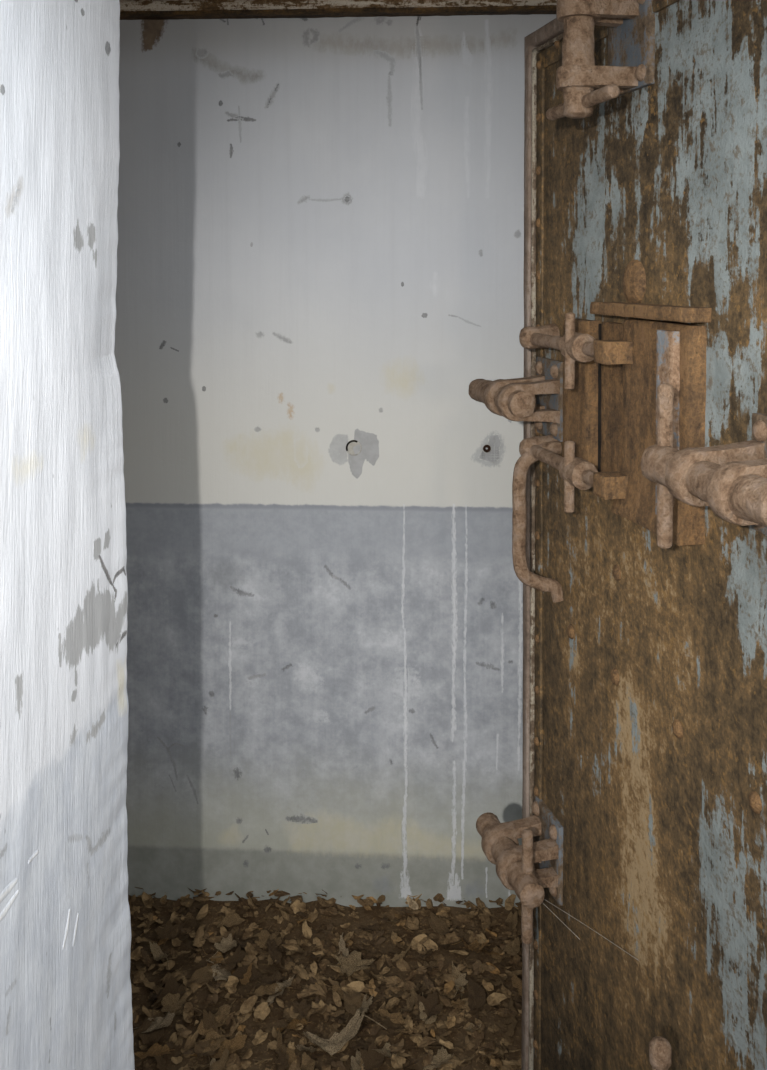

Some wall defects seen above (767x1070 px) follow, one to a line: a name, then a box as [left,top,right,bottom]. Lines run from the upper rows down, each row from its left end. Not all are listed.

peeling [314,426,381,481]
peeling [469,419,513,470]
water stain [213,613,262,781]
water stain [262,503,490,902]
water stain [500,579,523,771]